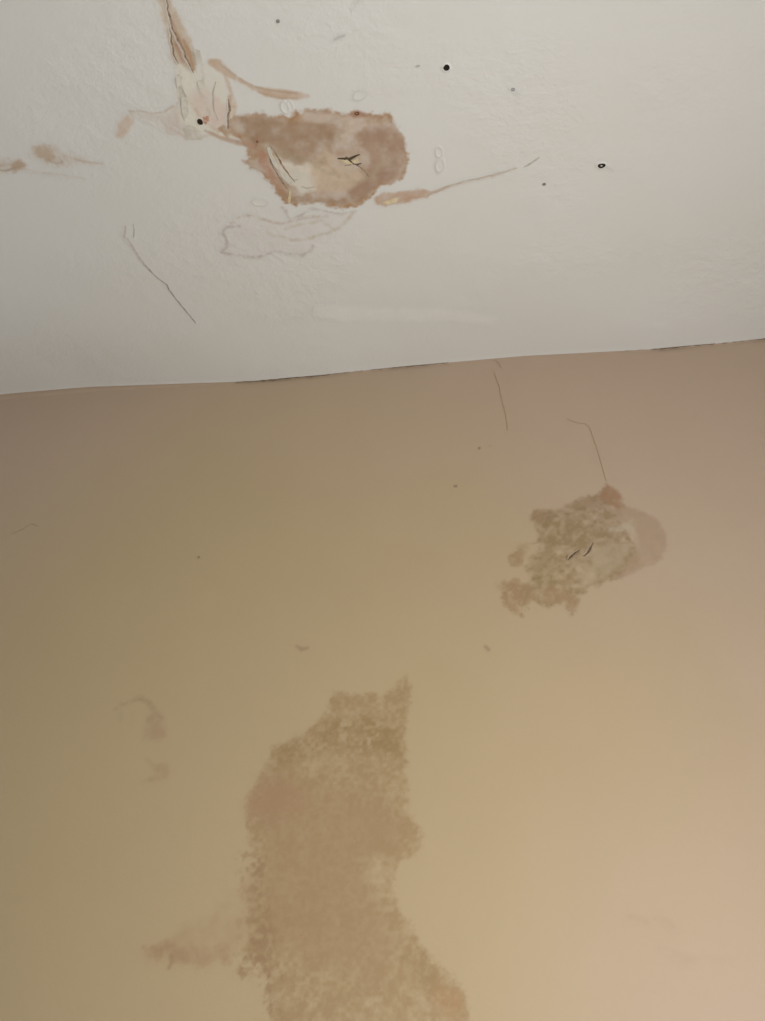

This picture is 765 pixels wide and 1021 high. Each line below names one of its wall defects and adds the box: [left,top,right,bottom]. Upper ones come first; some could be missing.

crack [153,0,198,73]
leakage [0,140,107,181]
leakage [113,102,189,141]
peeling [173,48,239,143]
leakage [203,56,411,260]
crack [121,224,196,323]
crack [236,362,448,383]
leakage [493,481,670,620]
leakage [139,673,474,1021]